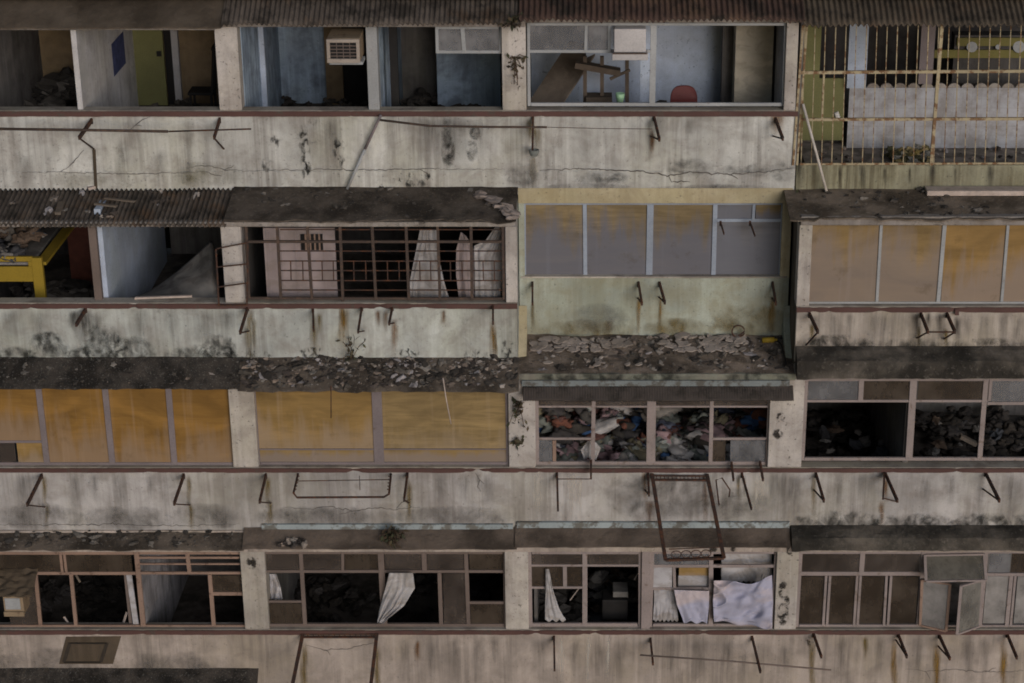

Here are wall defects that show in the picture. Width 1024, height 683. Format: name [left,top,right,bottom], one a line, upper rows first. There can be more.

crack [548,168,792,183]
damp [0,333,59,358]
damp [71,314,142,358]